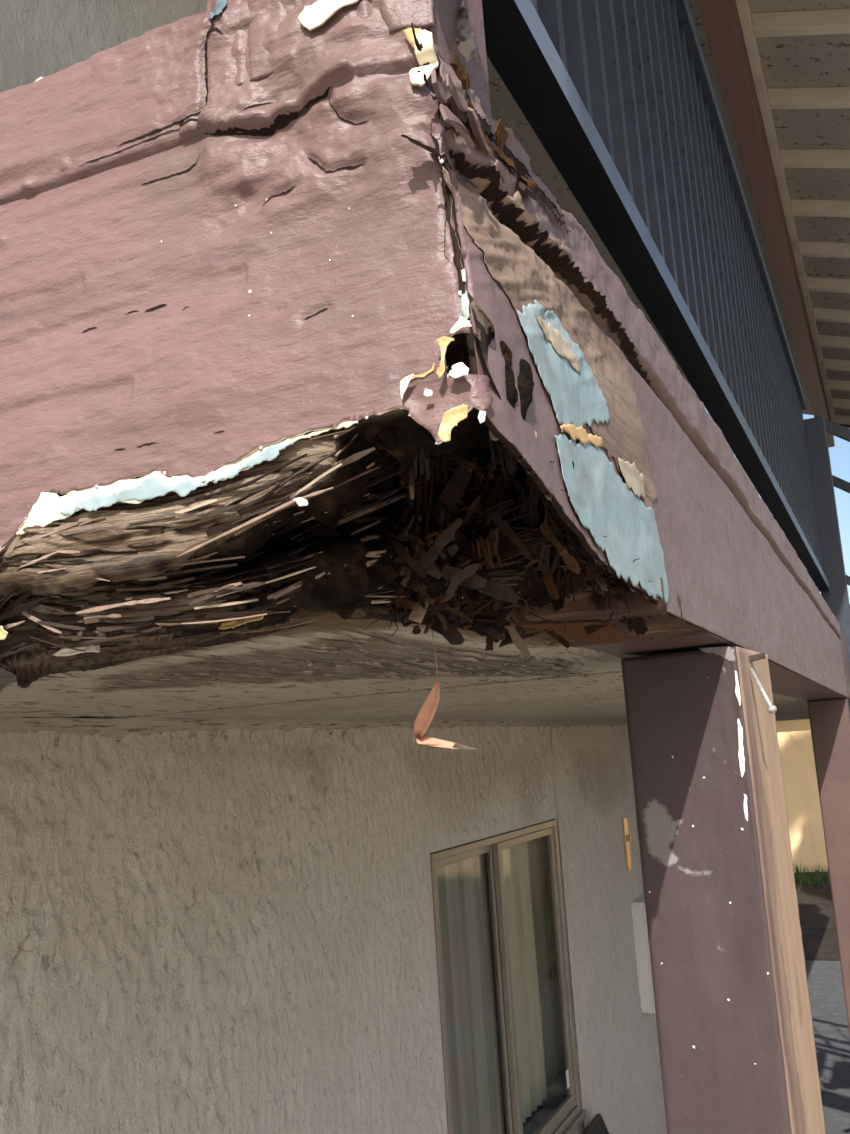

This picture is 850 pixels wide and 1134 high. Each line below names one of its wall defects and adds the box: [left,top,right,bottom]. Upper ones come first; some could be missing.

peeling [298,0,359,31]
peeling [404,28,439,87]
peeling [457,0,476,62]
crack [80,19,370,185]
crack [263,185,297,205]
peeling [400,269,472,400]
peeling [438,157,669,604]
peeling [16,419,359,535]
peeling [53,644,100,656]
peeling [218,610,265,630]
peeling [643,799,709,875]